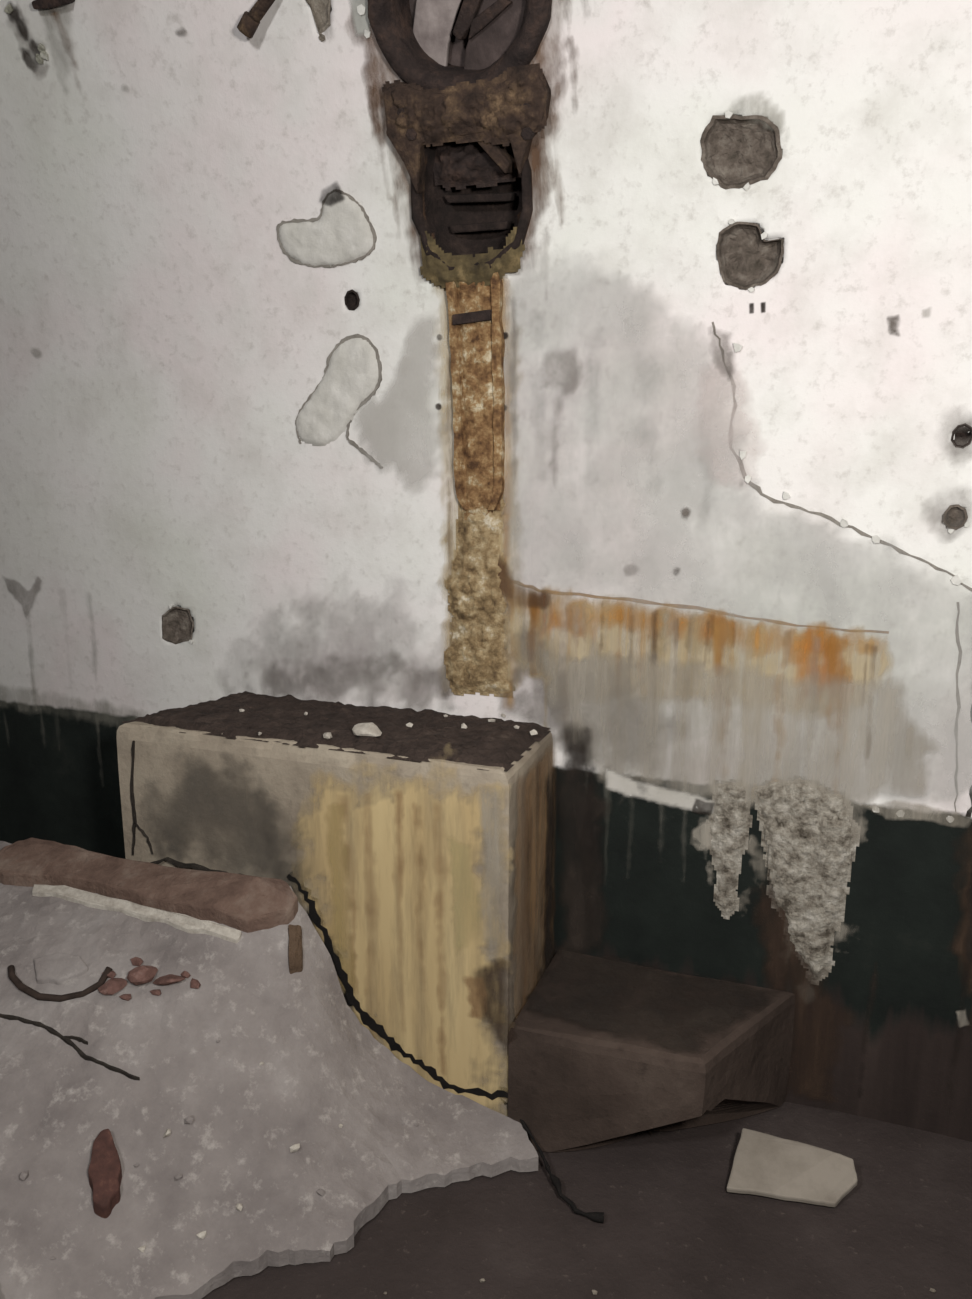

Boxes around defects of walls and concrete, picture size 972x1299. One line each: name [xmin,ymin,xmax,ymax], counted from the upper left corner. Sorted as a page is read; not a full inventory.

corrosion [352,16,404,133]
corrosion [524,39,560,249]
spalling [700,111,782,190]
spalling [716,219,784,292]
corrosion [442,277,889,711]
spalling [162,605,194,644]
crack [130,741,244,875]
water stain [526,658,929,1051]
crack [954,602,972,818]
crack [287,872,604,1223]